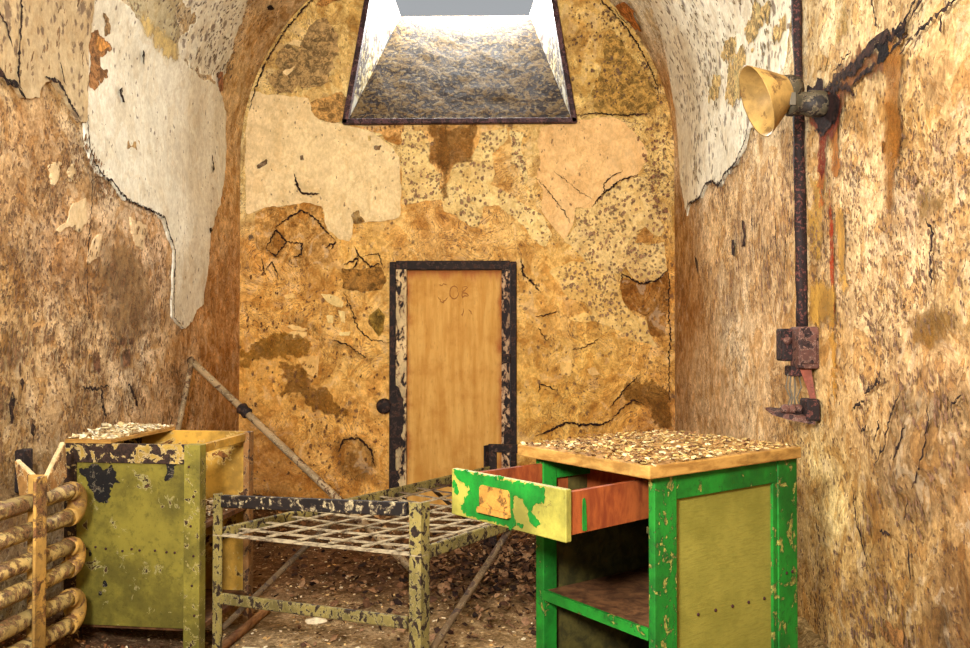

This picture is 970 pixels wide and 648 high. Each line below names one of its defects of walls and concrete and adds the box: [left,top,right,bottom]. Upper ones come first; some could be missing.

peeling [0,0,248,449]
flaking render [245,0,439,469]
damp [428,124,477,197]
peeling [442,0,793,339]
corrosion [808,128,848,405]
crack [824,0,956,108]
crack [853,377,880,442]
crack [851,484,911,580]